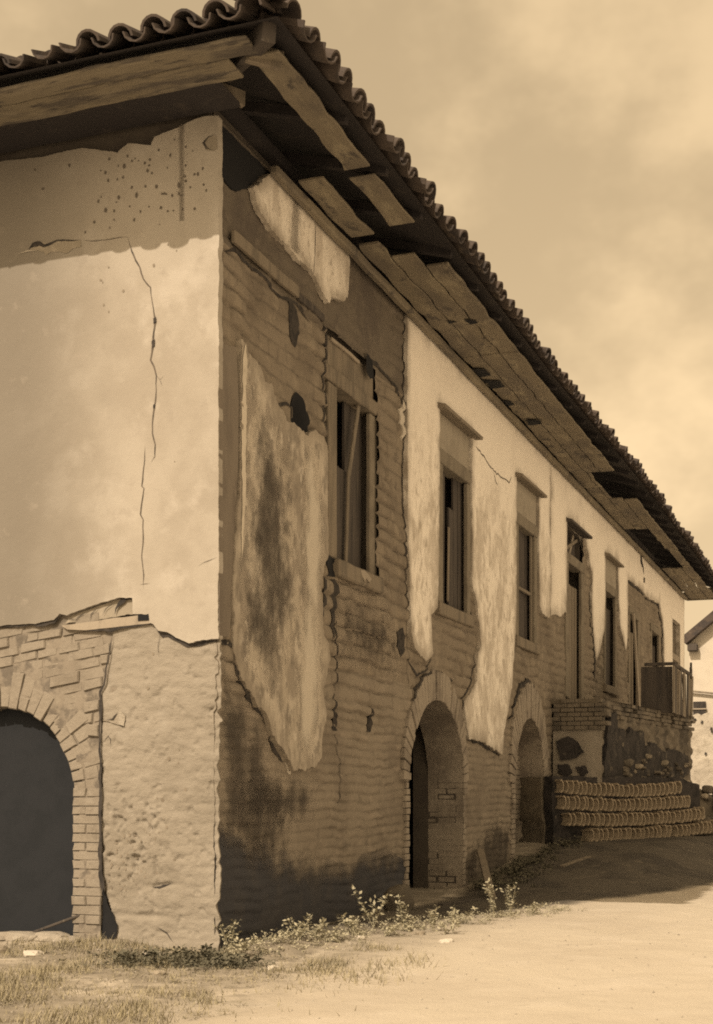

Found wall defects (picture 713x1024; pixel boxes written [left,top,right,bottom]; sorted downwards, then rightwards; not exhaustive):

spalling [97,149,207,229]
flaking render [66,598,149,623]
crack [82,237,161,584]
water stain [253,461,286,651]
water stain [301,460,321,745]
flaking render [174,114,478,892]
flaking render [504,608,588,776]
flaking render [582,541,663,706]
water stain [214,714,406,950]